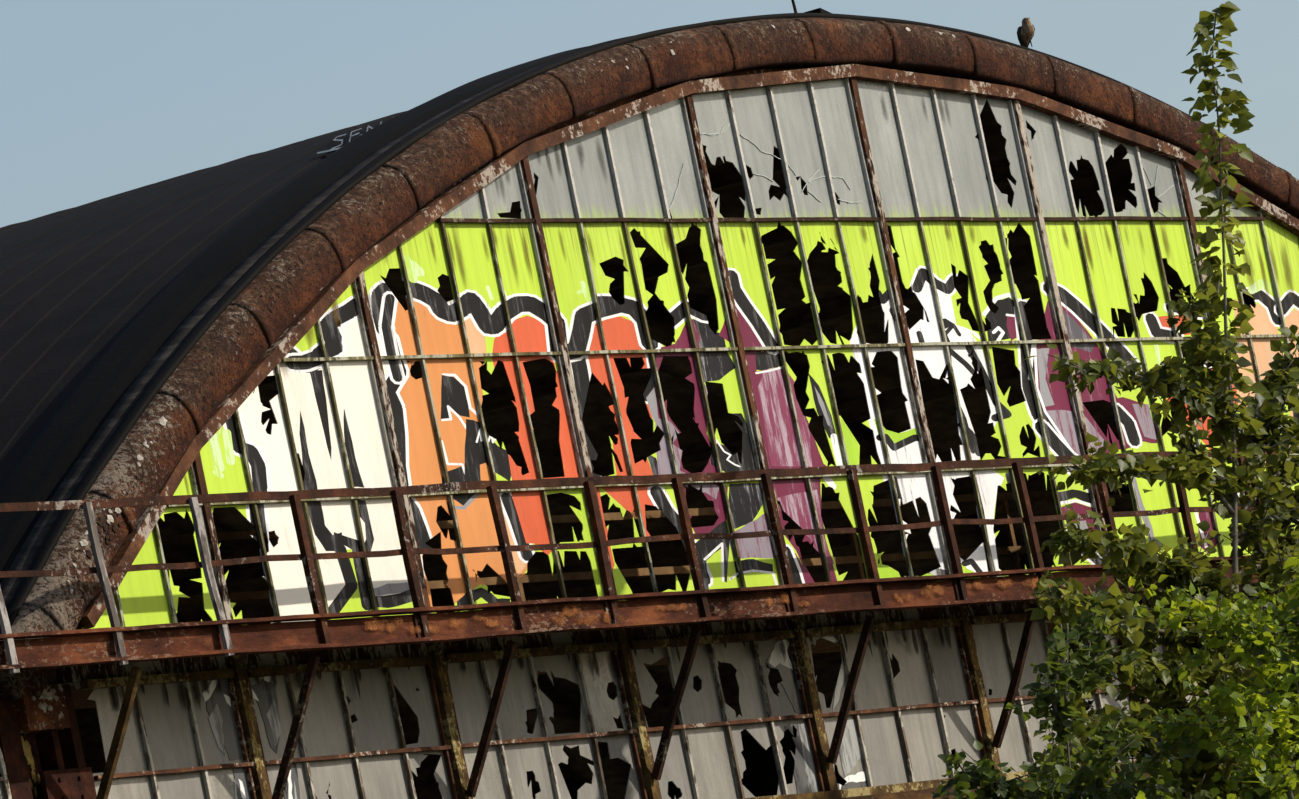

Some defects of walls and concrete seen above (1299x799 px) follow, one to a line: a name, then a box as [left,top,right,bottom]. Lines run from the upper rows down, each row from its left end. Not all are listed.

corrosion [485,230,531,271]
corrosion [1246,253,1292,288]
corrosion [898,584,943,602]
corrosion [556,604,609,624]
corrosion [368,617,460,632]